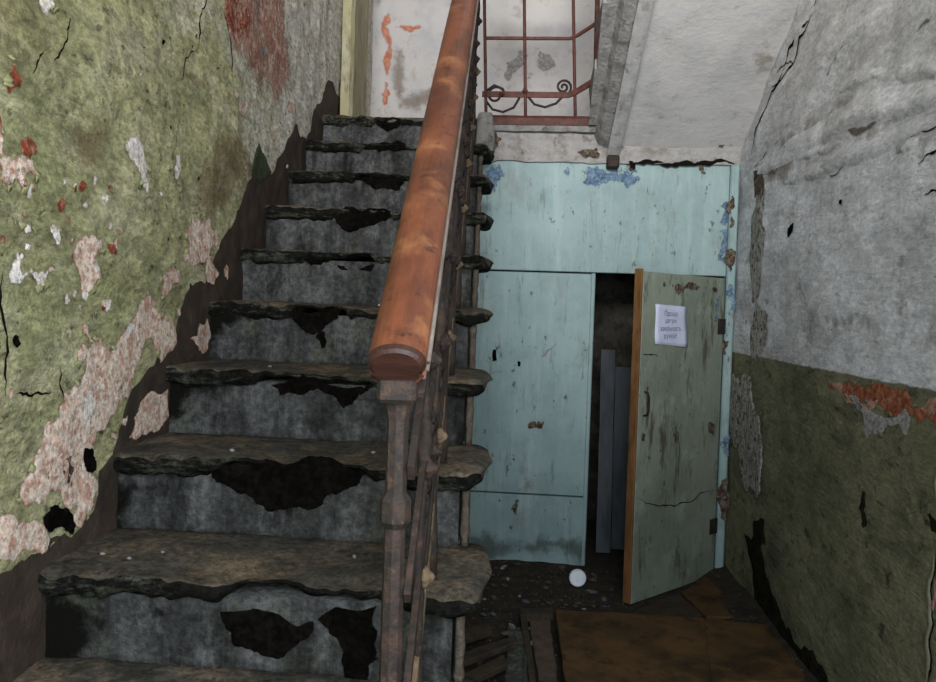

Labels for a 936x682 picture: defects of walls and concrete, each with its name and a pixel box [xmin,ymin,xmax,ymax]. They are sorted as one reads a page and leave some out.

peeling [39,0,59,16]
peeling [224,0,295,116]
peeling [63,175,98,208]
peeling [577,148,640,188]
crack [848,122,875,136]
crack [911,126,936,166]
peeling [0,198,229,566]
peeling [828,380,936,439]
flaking render [212,456,364,512]
crack [924,548,936,682]